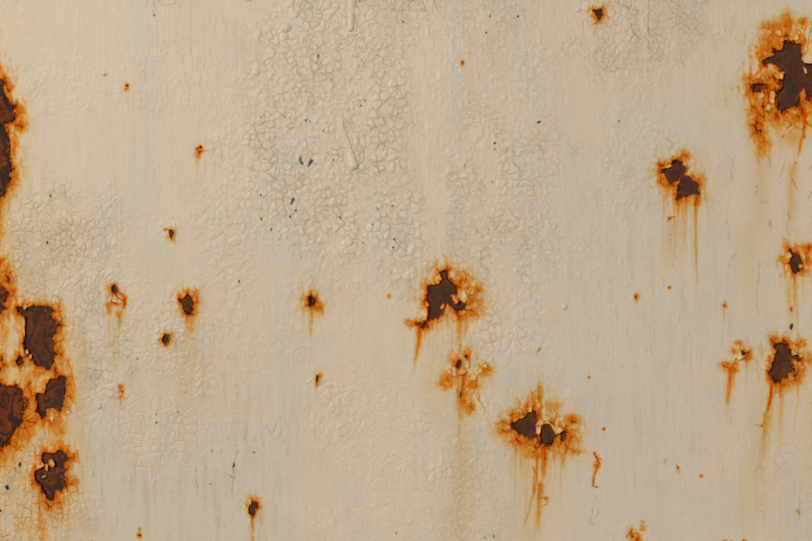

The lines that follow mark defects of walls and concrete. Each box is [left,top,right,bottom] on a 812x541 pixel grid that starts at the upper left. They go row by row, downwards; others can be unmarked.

corrosion [746,18,812,148]
corrosion [0,68,23,201]
corrosion [658,154,701,205]
corrosion [786,245,811,277]
corrosion [178,292,196,317]
corrosion [306,294,319,310]
corrosion [408,266,481,344]
corrosion [0,271,71,458]
corrosion [766,338,810,404]
corrosion [501,396,576,461]
corrosion [31,447,75,509]
corrosion [248,499,259,518]